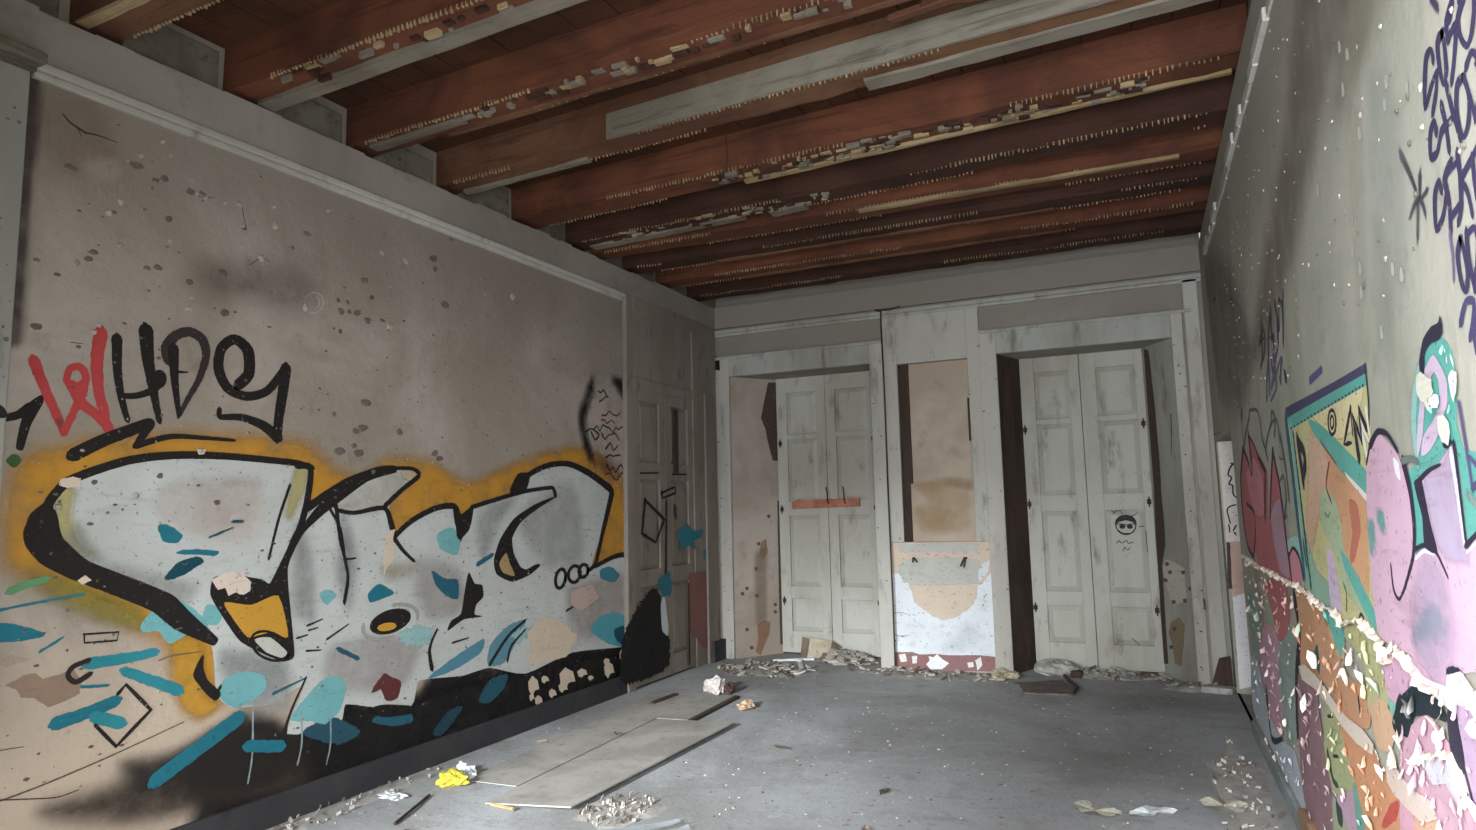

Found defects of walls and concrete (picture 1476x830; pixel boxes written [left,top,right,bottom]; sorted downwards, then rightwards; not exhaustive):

crack [62,113,118,143]
peeling [1144,345,1476,830]
peeling [895,636,949,669]